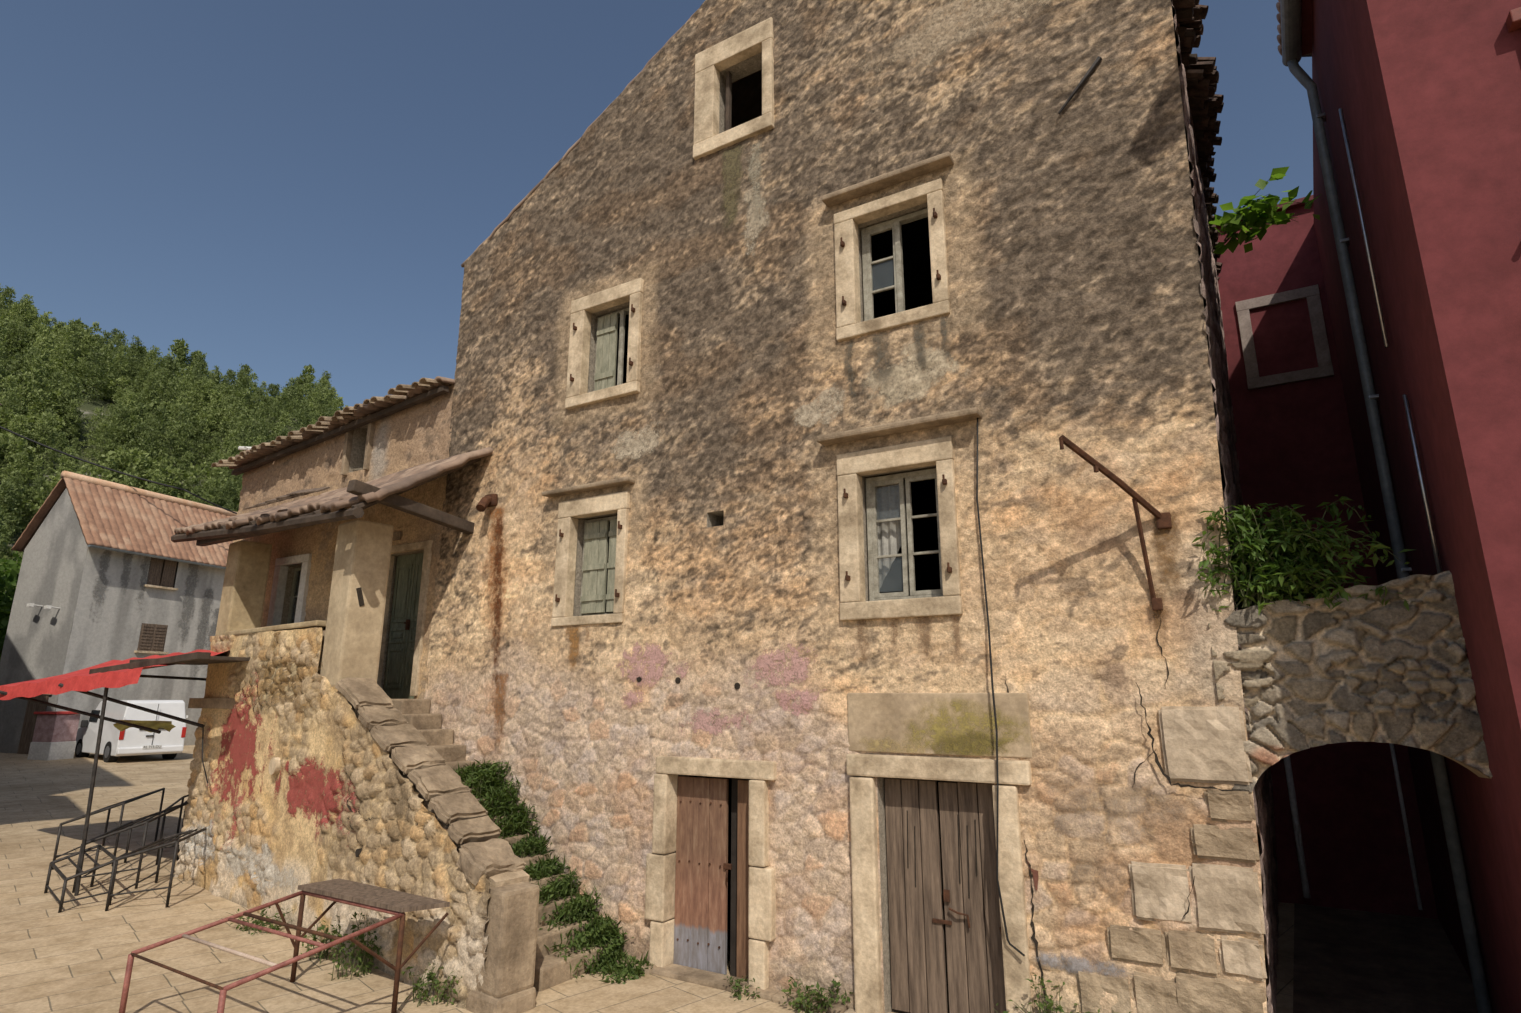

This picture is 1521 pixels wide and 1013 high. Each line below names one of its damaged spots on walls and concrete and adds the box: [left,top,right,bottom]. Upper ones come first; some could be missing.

corrosion [1153,514,1179,628]
crack [1132,616,1249,791]
crack [1024,840,1046,1001]